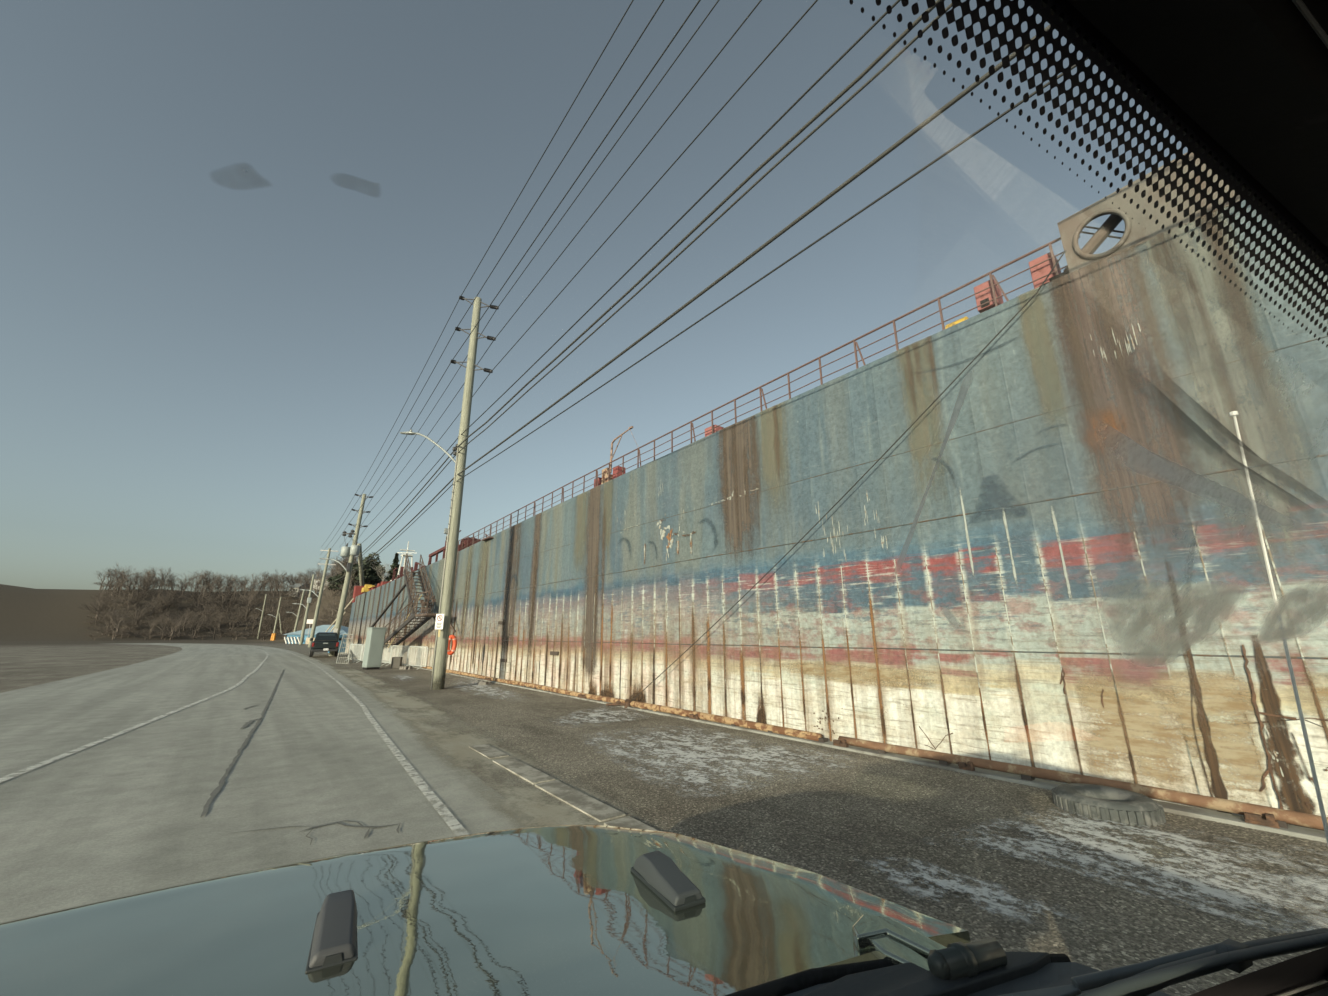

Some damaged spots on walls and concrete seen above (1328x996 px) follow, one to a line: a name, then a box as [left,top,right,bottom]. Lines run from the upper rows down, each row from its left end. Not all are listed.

corrosion [898,336,940,477]
corrosion [1050,208,1312,556]
peeling [657,519,696,562]
corrosion [719,403,784,555]
corrosion [435,480,953,754]
corrosion [979,690,991,760]
corrosion [1015,666,1035,767]